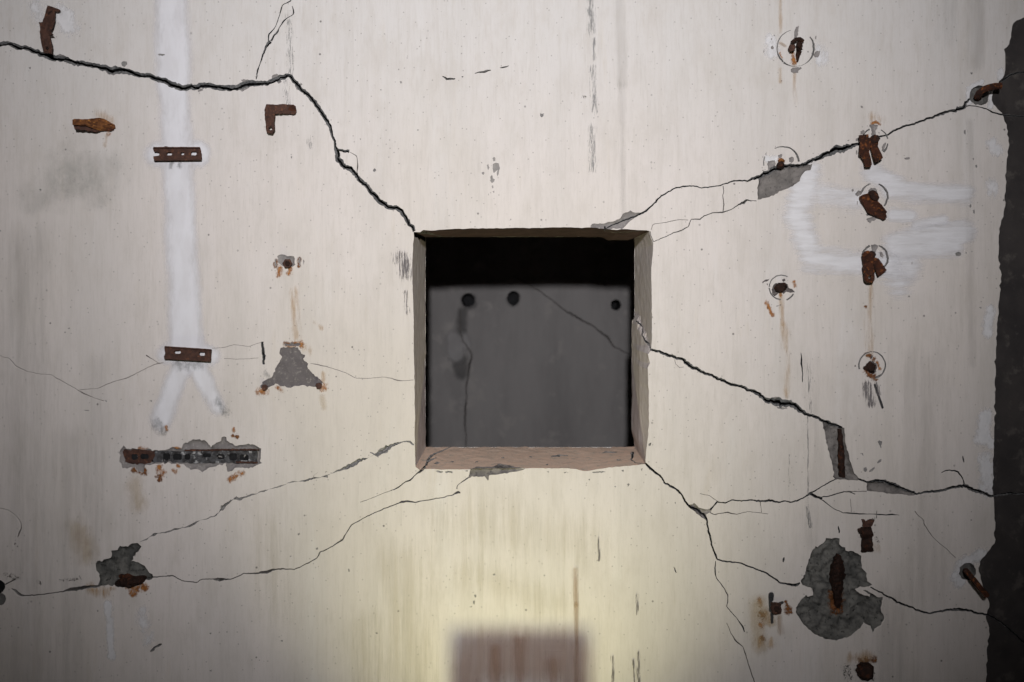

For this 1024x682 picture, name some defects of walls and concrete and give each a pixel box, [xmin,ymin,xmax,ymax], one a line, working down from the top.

water stain [147,0,224,429]
crack [0,0,444,242]
crack [603,98,1024,242]
crack [1000,71,1024,82]
peeling [260,342,323,388]
spalling [119,437,261,473]
crack [140,309,473,583]
spalling [822,422,919,496]
crack [5,578,101,596]
spalling [96,543,153,587]
crack [630,452,1024,682]
spalling [796,526,884,641]